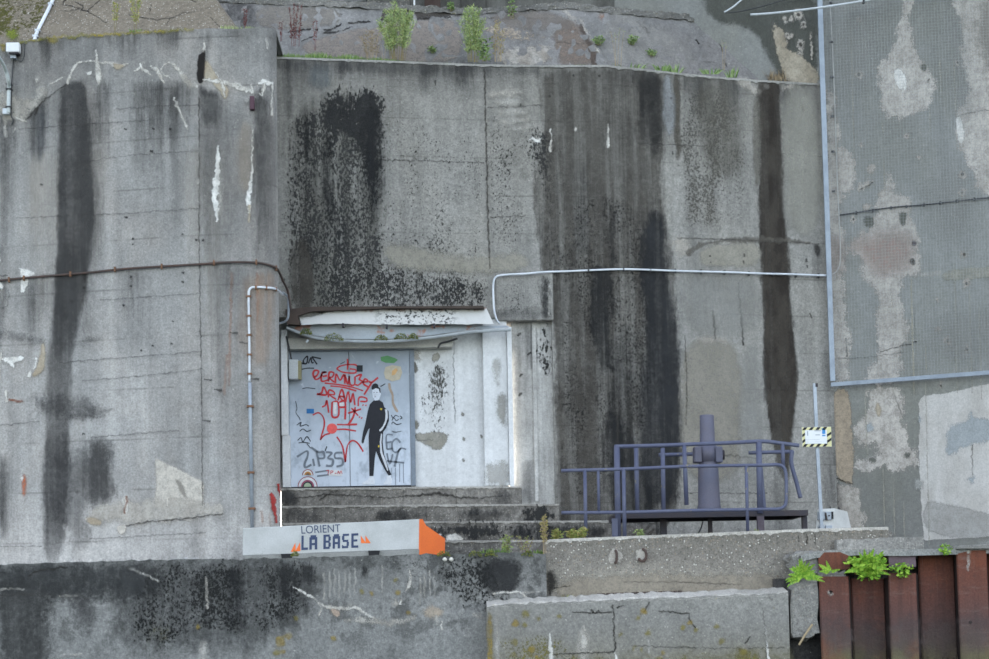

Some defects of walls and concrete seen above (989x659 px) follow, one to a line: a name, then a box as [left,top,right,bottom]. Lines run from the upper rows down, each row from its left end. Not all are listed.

peeling [773,23,819,83]
peeling [876,0,937,122]
peeling [952,0,989,195]
leakage [0,50,274,540]
leakage [282,15,820,617]
peeling [826,89,922,528]
leakage [0,558,443,659]
leakage [580,627,588,659]
crack [554,602,696,655]